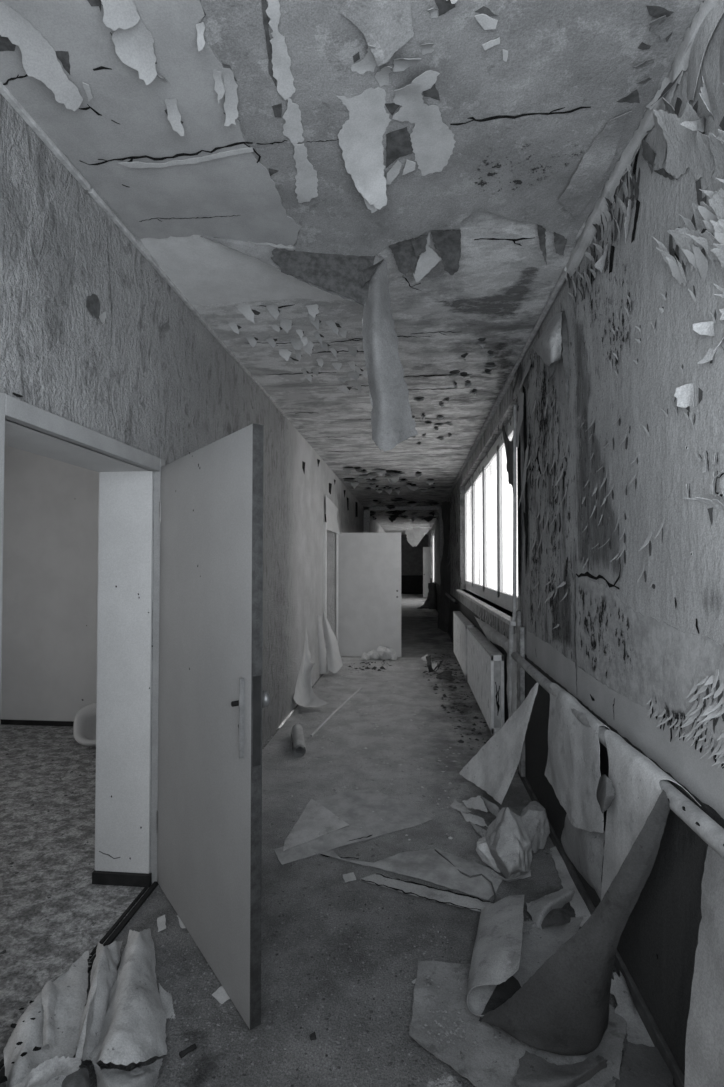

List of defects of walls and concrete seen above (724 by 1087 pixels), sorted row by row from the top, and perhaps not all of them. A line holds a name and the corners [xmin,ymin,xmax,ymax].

crack [79,139,339,187]
peeling [0,0,724,394]
crack [450,107,591,125]
peeling [329,467,460,588]
crack [574,564,621,713]